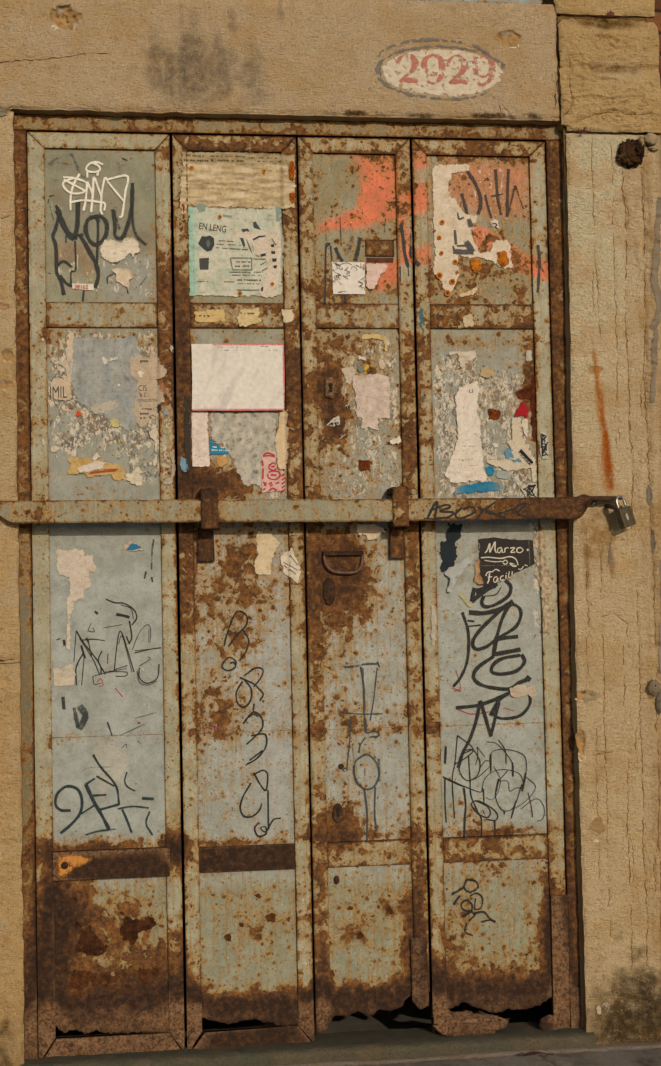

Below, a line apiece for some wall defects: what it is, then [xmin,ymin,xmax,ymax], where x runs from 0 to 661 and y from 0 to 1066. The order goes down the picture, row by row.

spalling [47,4,82,32]
spalling [495,30,523,49]
corrosion [593,352,613,489]
damp [595,975,661,1045]